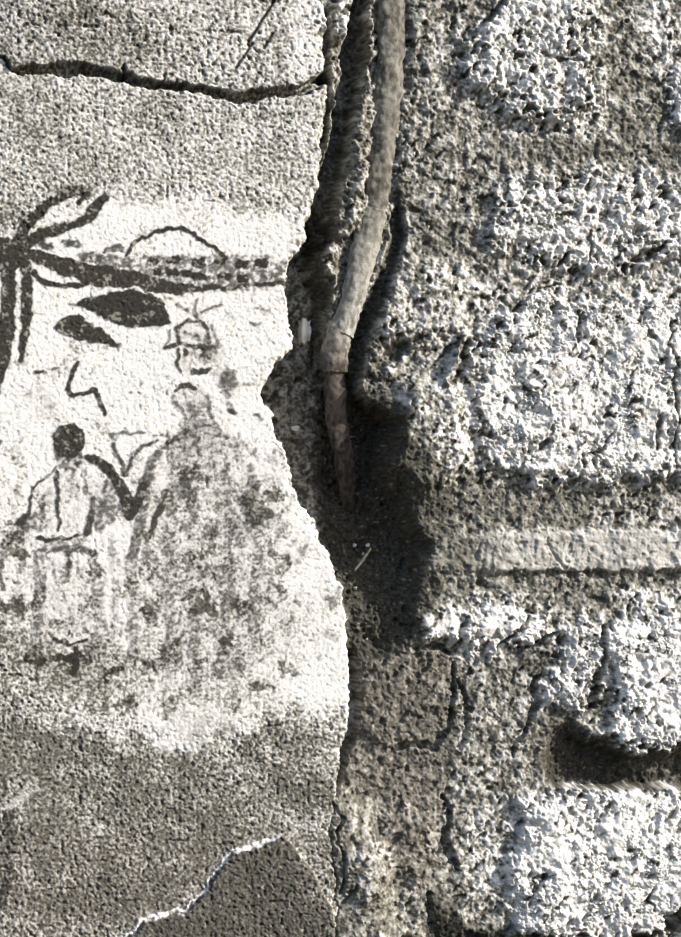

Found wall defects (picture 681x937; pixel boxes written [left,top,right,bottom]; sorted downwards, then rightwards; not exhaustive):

crack [0,0,432,894]
spalling [124,834,335,937]